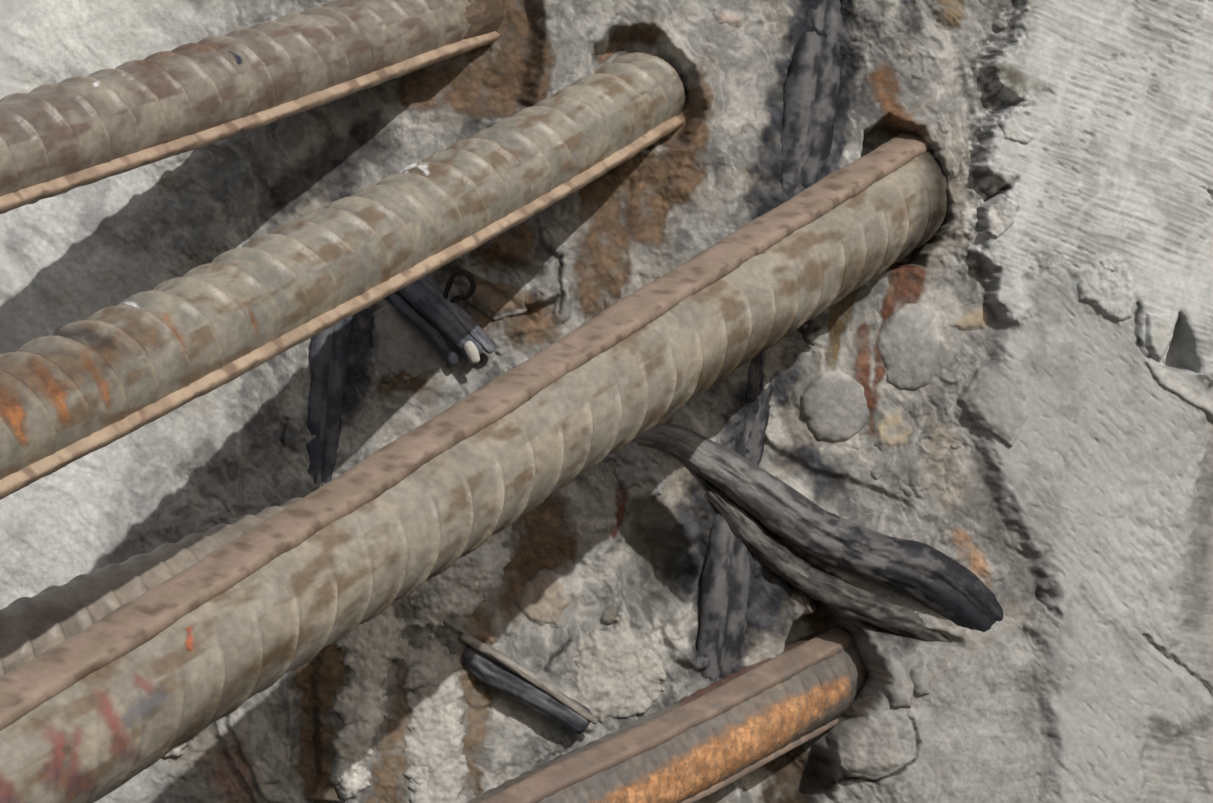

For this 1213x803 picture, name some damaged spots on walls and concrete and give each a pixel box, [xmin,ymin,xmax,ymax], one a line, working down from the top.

corrosion [400,0,555,119]
corrosion [599,26,659,62]
corrosion [870,66,924,138]
corrosion [574,70,714,317]
corrosion [882,259,926,322]
spalling [0,0,948,803]
spalling [466,0,1213,803]
corrosion [826,287,885,434]
corrosion [803,599,847,634]
crack [1144,635,1213,696]
corrosion [462,671,491,795]
corrosion [762,746,833,803]